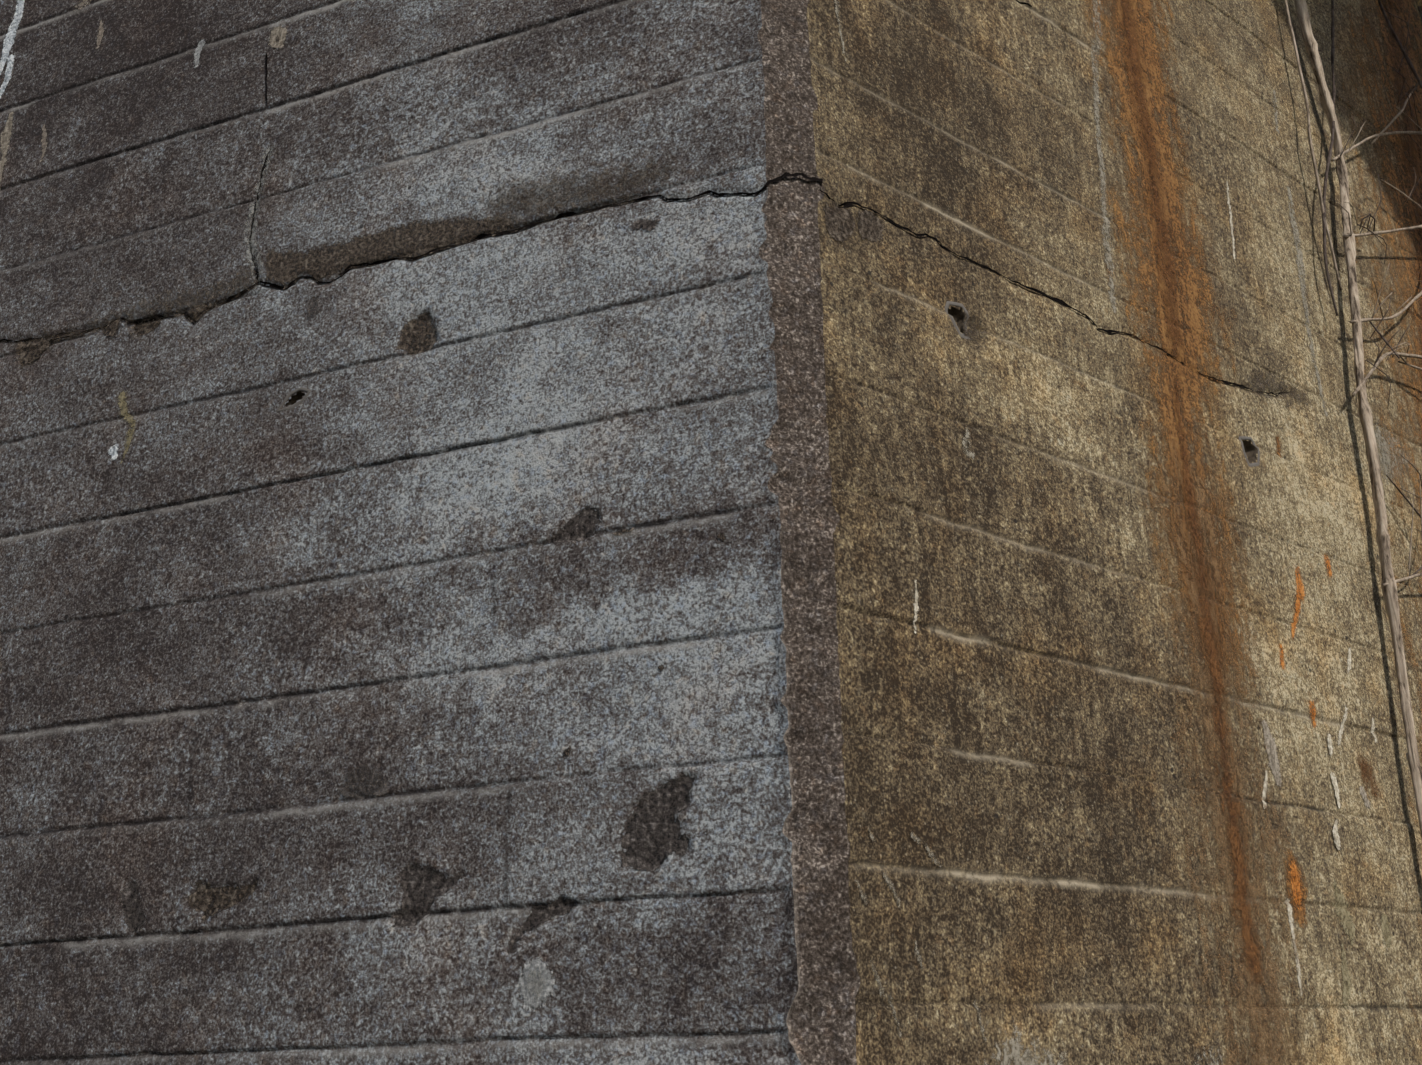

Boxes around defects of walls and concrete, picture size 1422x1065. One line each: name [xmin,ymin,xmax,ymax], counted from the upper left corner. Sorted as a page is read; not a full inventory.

leakage [0,0,25,98]
leakage [96,20,104,49]
leakage [0,112,14,190]
spalling [12,161,672,368]
crack [0,144,1291,397]
rust [1337,0,1422,528]
peeling [620,774,695,872]